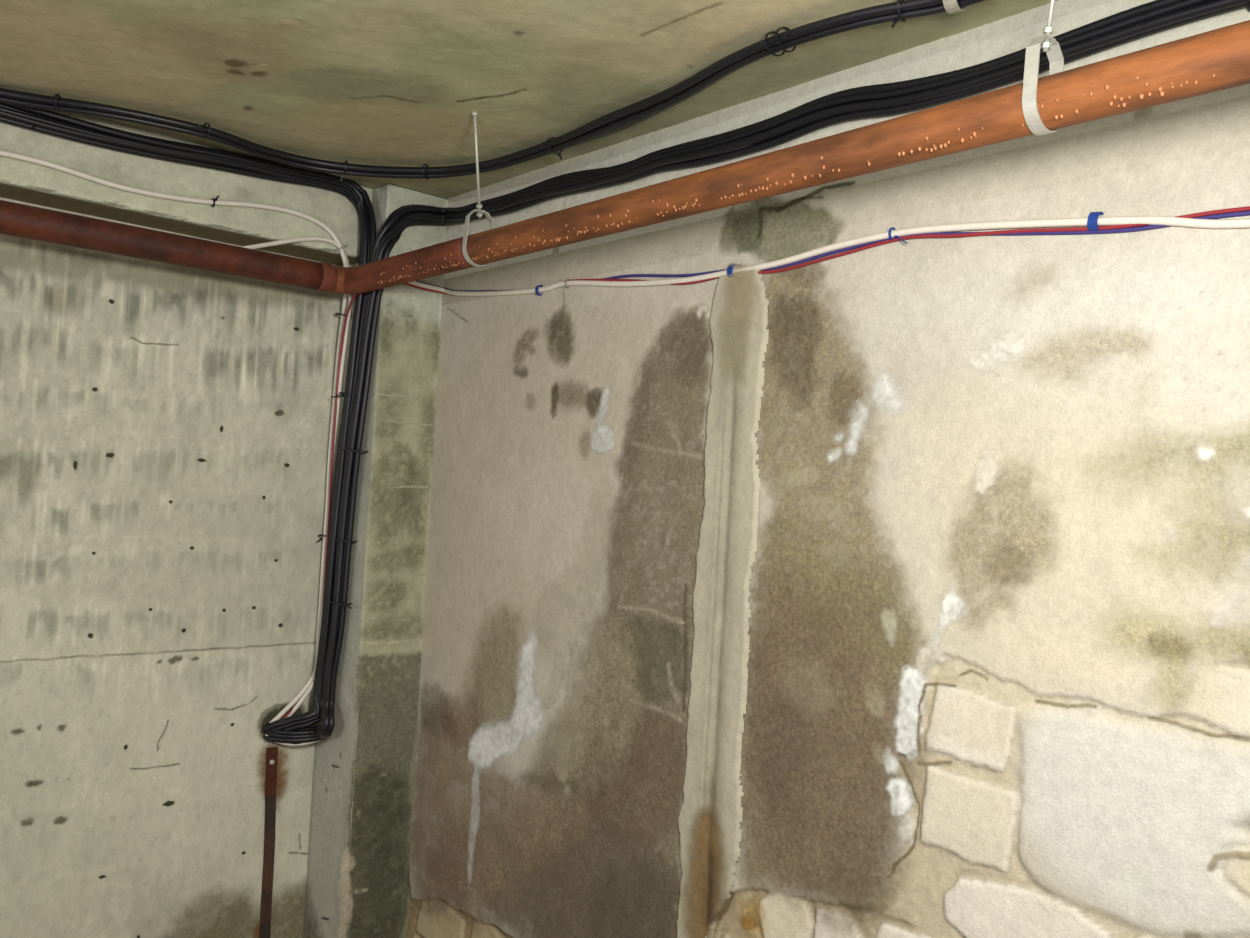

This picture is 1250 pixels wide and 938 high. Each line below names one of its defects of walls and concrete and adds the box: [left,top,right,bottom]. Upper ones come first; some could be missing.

water stain [1190,434,1250,475]
water stain [721,197,951,899]
water stain [939,450,1050,627]
water stain [345,305,710,938]
corrosion [261,746,287,797]
water stain [186,888,316,938]
corrosion [687,812,723,938]